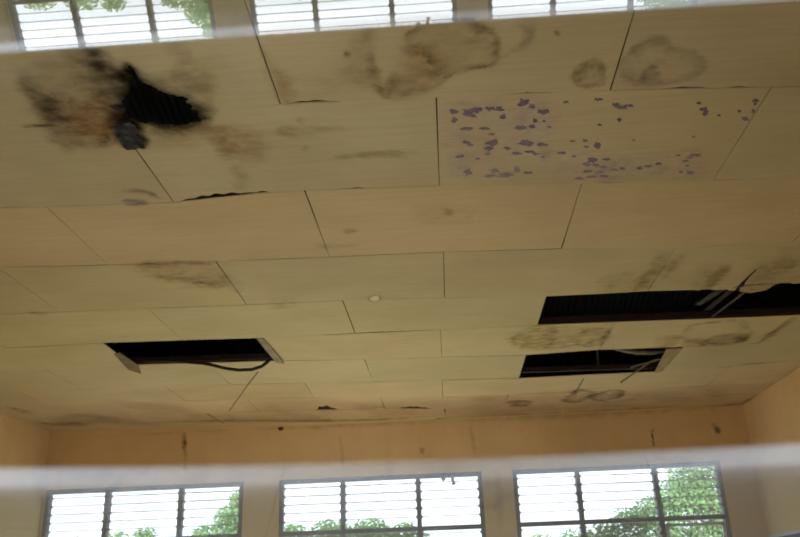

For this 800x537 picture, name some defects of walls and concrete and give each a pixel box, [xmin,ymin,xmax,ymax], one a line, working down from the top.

leakage [110,67,210,144]
peeling [449,98,551,160]
peeling [558,139,625,180]